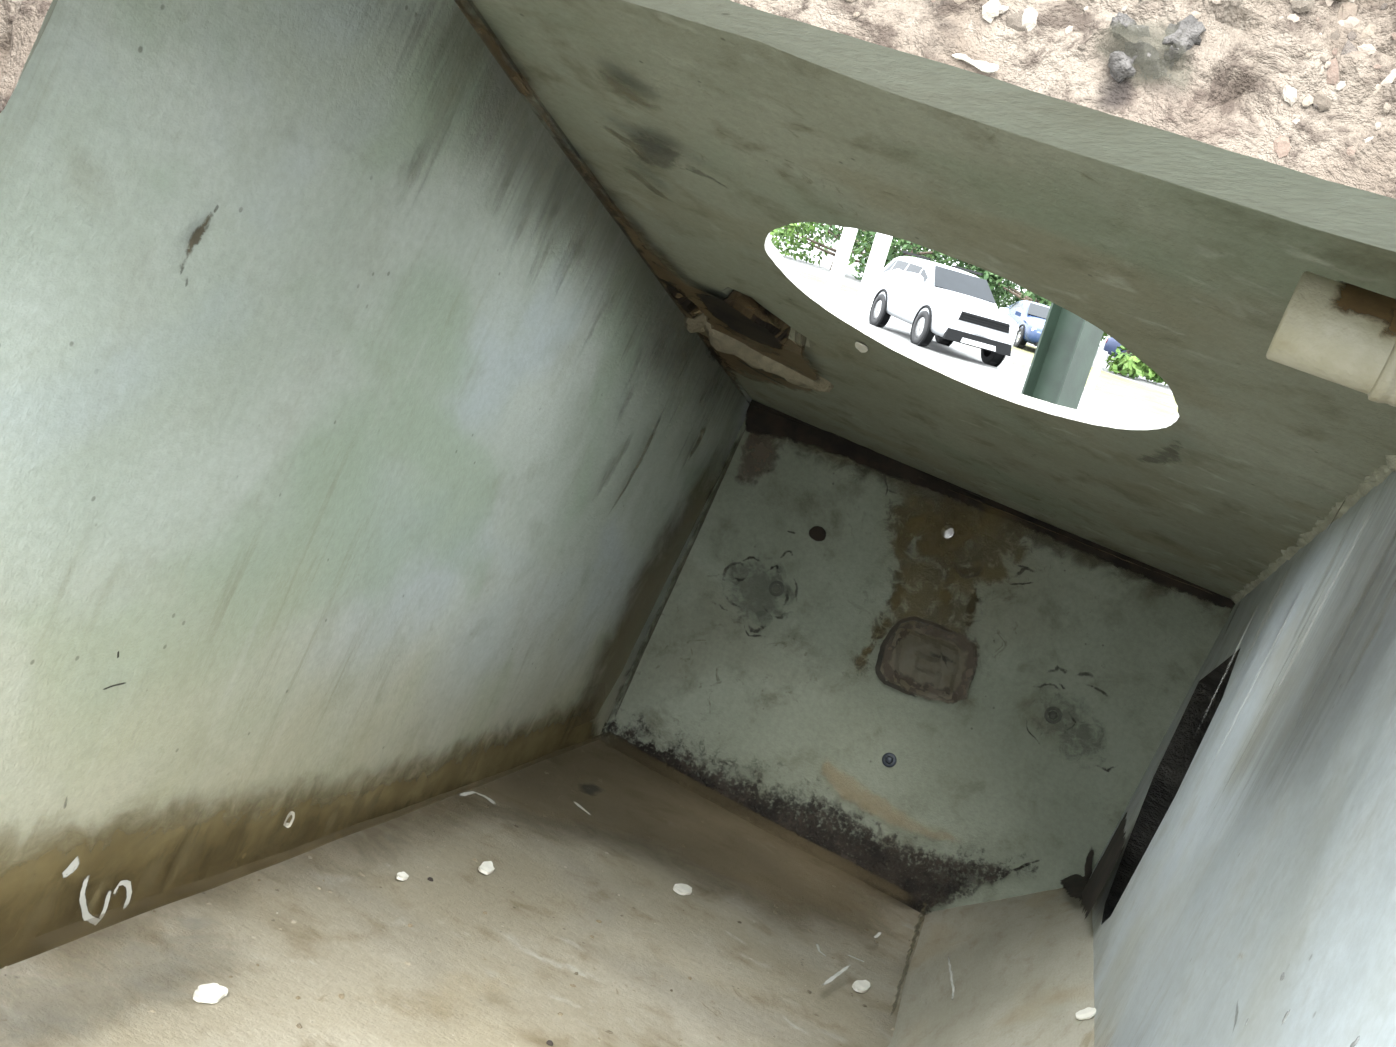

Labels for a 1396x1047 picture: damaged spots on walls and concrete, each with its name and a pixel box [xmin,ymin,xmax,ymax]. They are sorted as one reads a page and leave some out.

spalling [665,281,834,392]
water stain [0,432,1040,969]